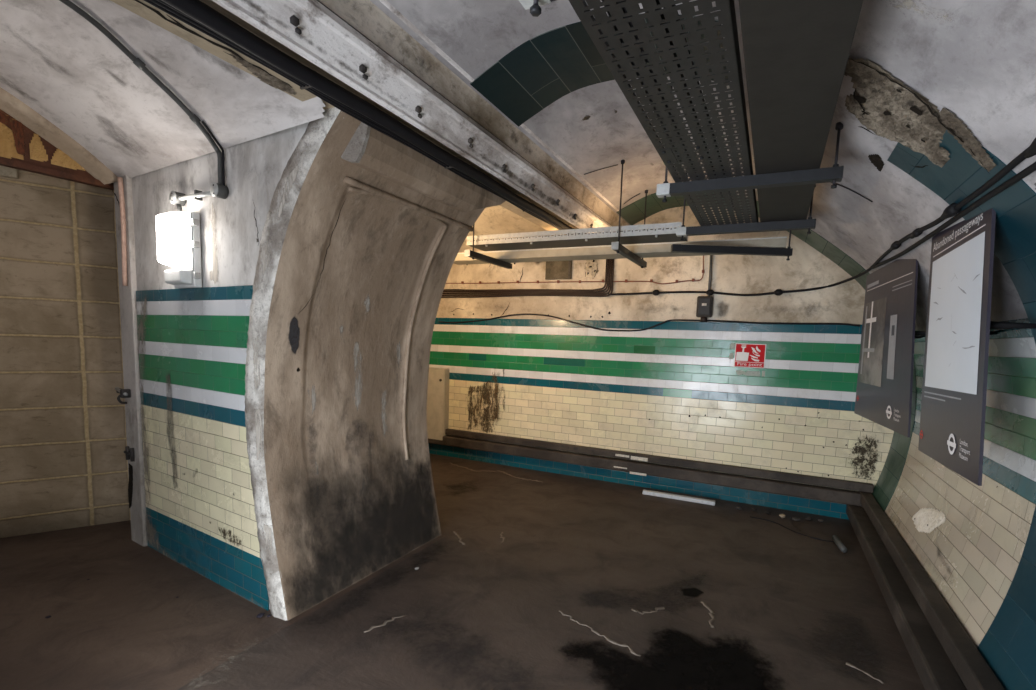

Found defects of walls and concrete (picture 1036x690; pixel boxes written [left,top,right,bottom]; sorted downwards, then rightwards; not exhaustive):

flaking render [844,57,997,173]
damp [166,375,177,485]
damp [468,370,505,433]
damp [849,435,878,479]
damp [293,460,443,617]
damp [561,629,782,690]